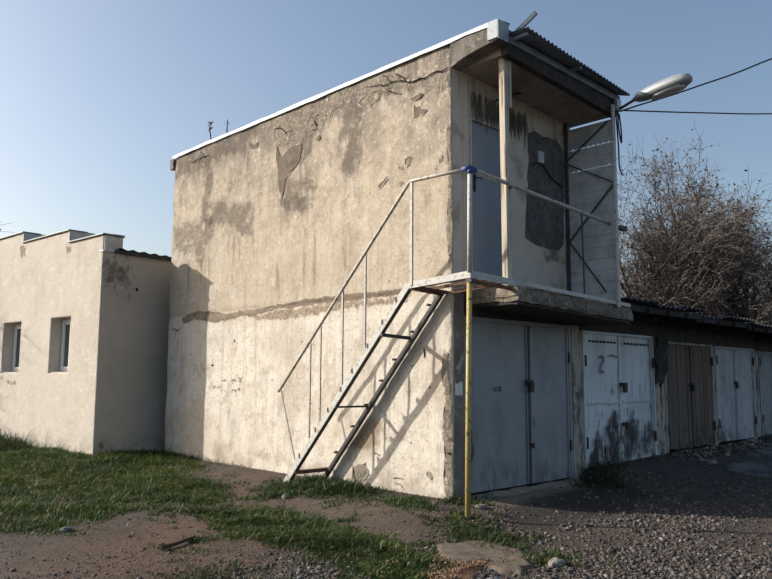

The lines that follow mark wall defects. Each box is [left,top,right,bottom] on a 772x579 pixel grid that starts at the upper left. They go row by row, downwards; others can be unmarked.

crack [364,67,449,94]
spalling [273,70,449,199]
spalling [173,252,408,324]
spalling [352,462,370,482]